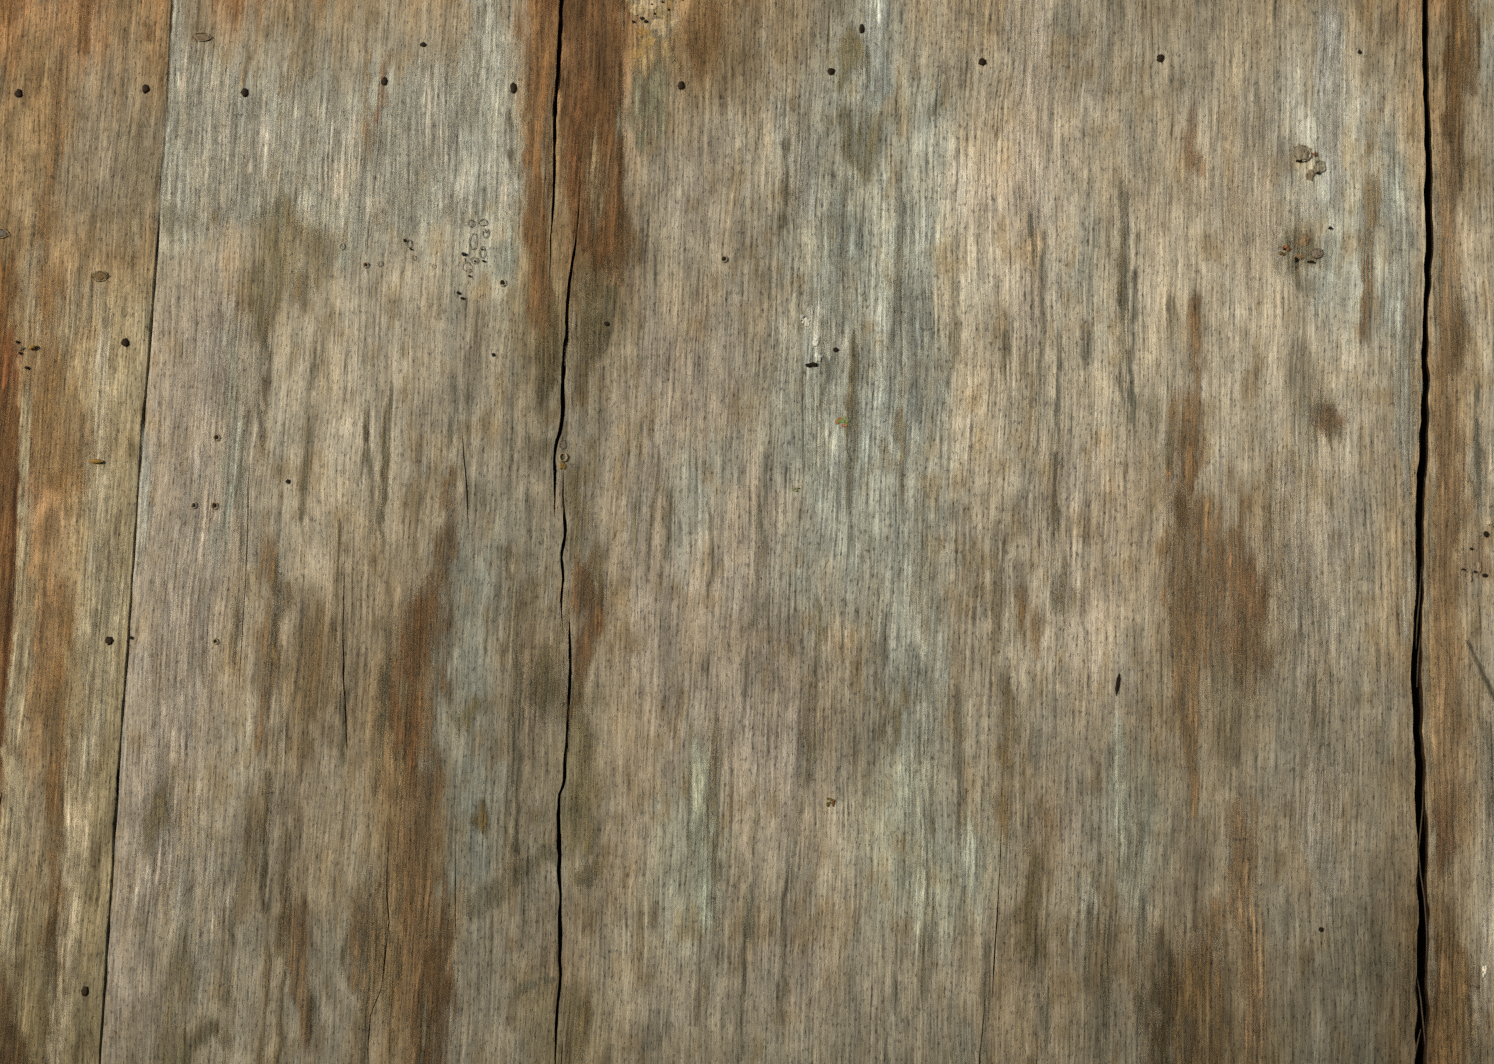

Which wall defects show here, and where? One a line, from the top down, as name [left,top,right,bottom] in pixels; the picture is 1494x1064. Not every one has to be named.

crack [539,0,581,1064]
crack [1400,0,1441,1064]